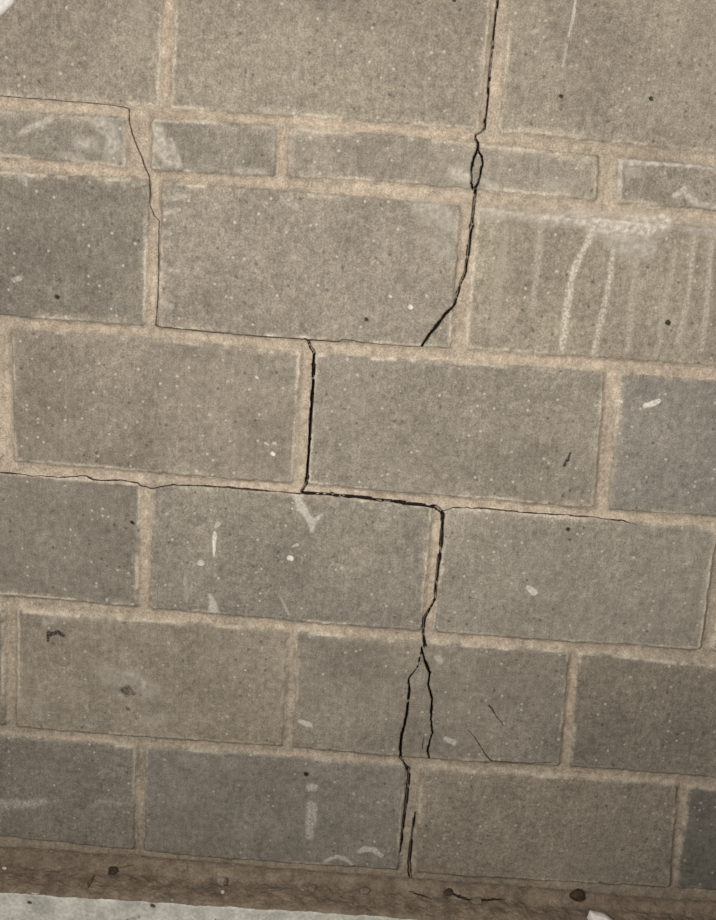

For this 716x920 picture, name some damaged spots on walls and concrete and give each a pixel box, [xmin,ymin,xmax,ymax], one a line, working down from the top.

crack [2,96,160,276]
crack [373,0,499,347]
crack [0,292,637,877]
crack [452,893,506,901]